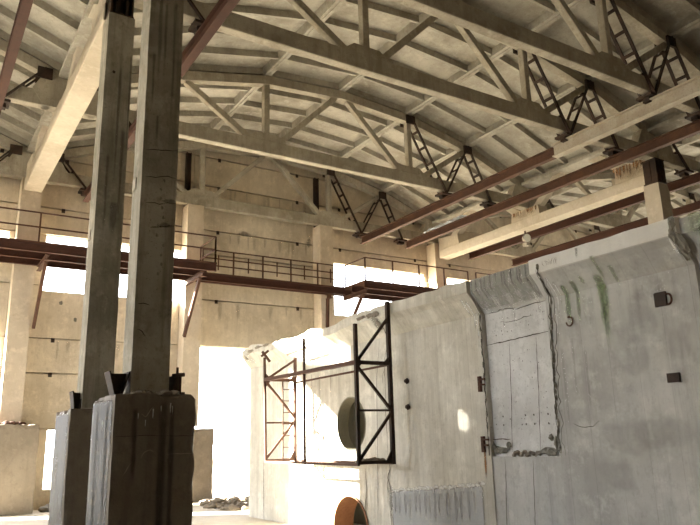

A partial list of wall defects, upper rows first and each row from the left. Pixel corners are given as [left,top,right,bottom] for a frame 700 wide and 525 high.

water stain [546,279,580,331]
water stain [590,257,609,330]
spalling [472,264,565,457]